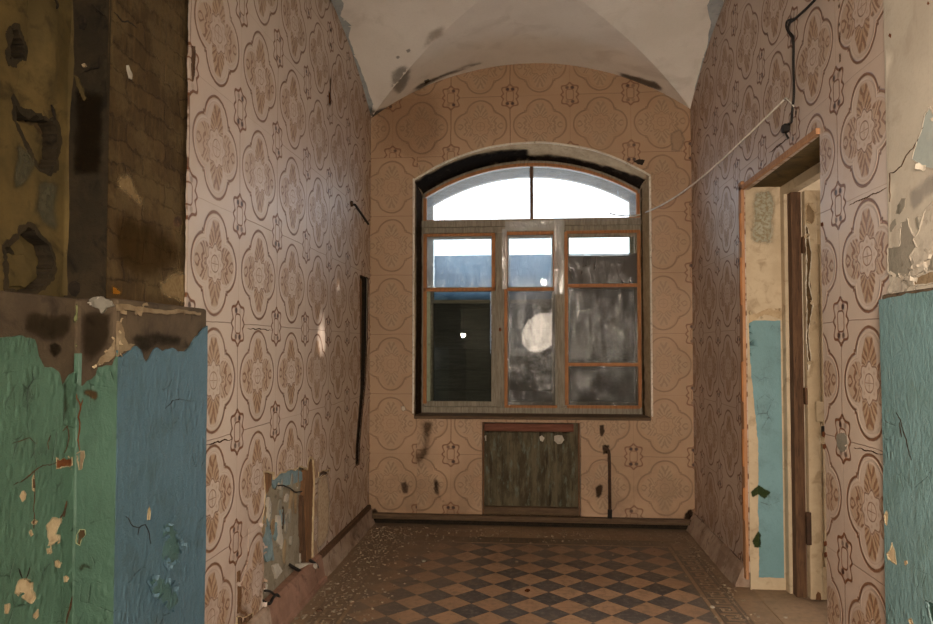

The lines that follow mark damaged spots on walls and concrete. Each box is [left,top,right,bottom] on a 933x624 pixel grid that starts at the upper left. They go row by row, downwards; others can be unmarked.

spalling [5,23,28,68]
peeling [695,0,725,89]
spalling [11,93,62,177]
damp [75,93,101,172]
peeling [911,106,933,171]
spalling [2,222,57,294]
peeling [887,198,933,290]
spalling [87,296,201,368]
spalling [29,517,69,582]
spalling [248,456,330,607]
spalling [4,578,39,620]